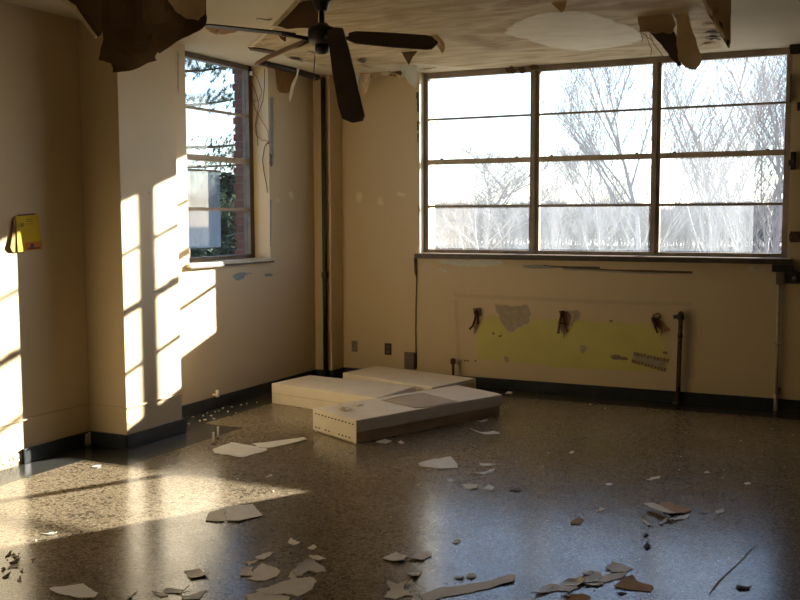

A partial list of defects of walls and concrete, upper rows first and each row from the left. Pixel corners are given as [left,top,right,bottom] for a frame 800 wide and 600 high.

peeling [247,19,332,69]
peeling [318,0,724,154]
peeling [464,303,670,374]